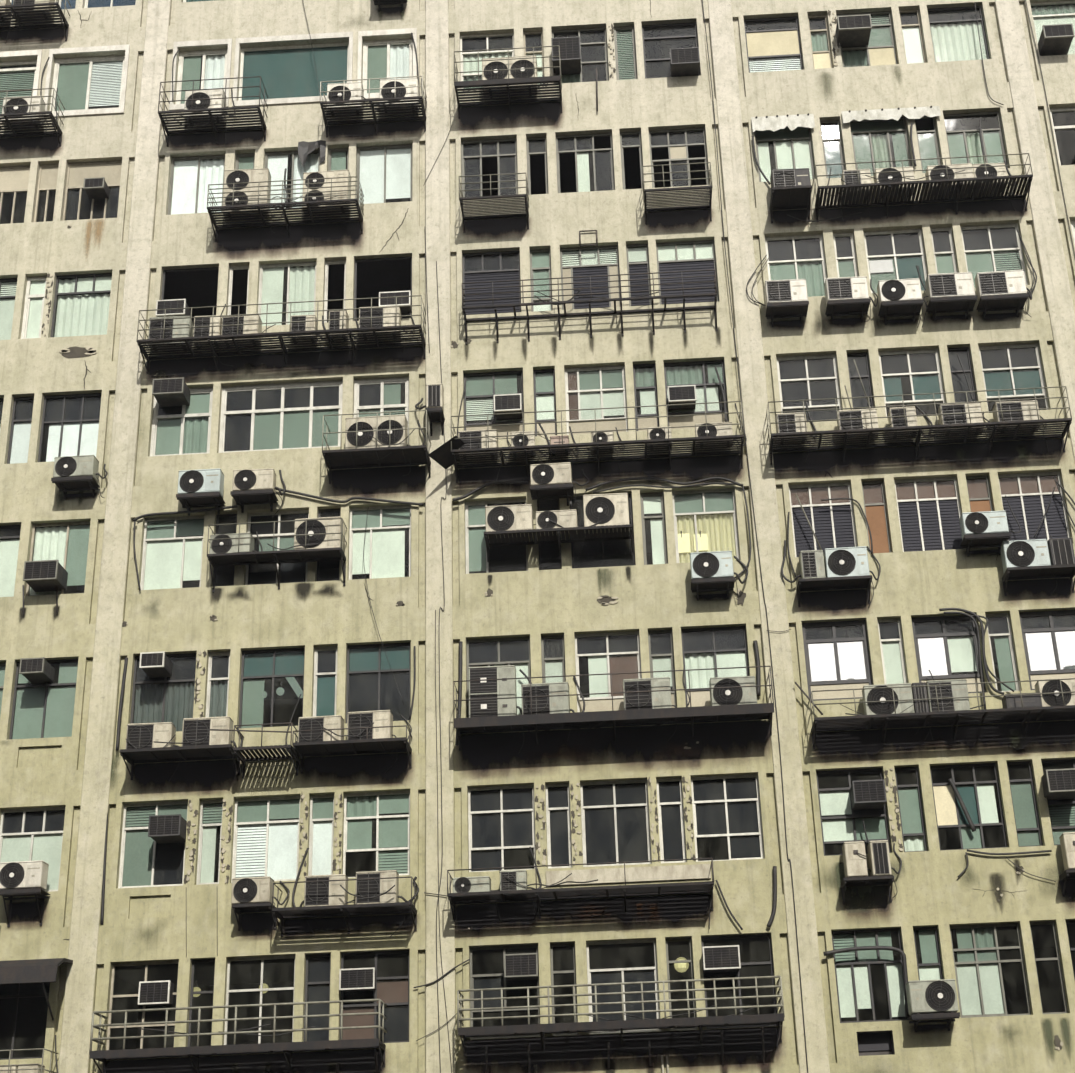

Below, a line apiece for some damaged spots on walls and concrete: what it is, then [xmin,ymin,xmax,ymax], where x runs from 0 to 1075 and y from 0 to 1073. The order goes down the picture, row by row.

rust [86,220,103,248]
spalling [59,346,97,358]
water stain [147,346,424,381]
water stain [459,720,771,776]
peeling [183,800,198,884]
peeling [221,799,233,884]
peeling [535,784,547,865]
peeling [570,783,583,864]
water stain [464,1026,781,1073]
water stain [1043,1018,1070,1054]